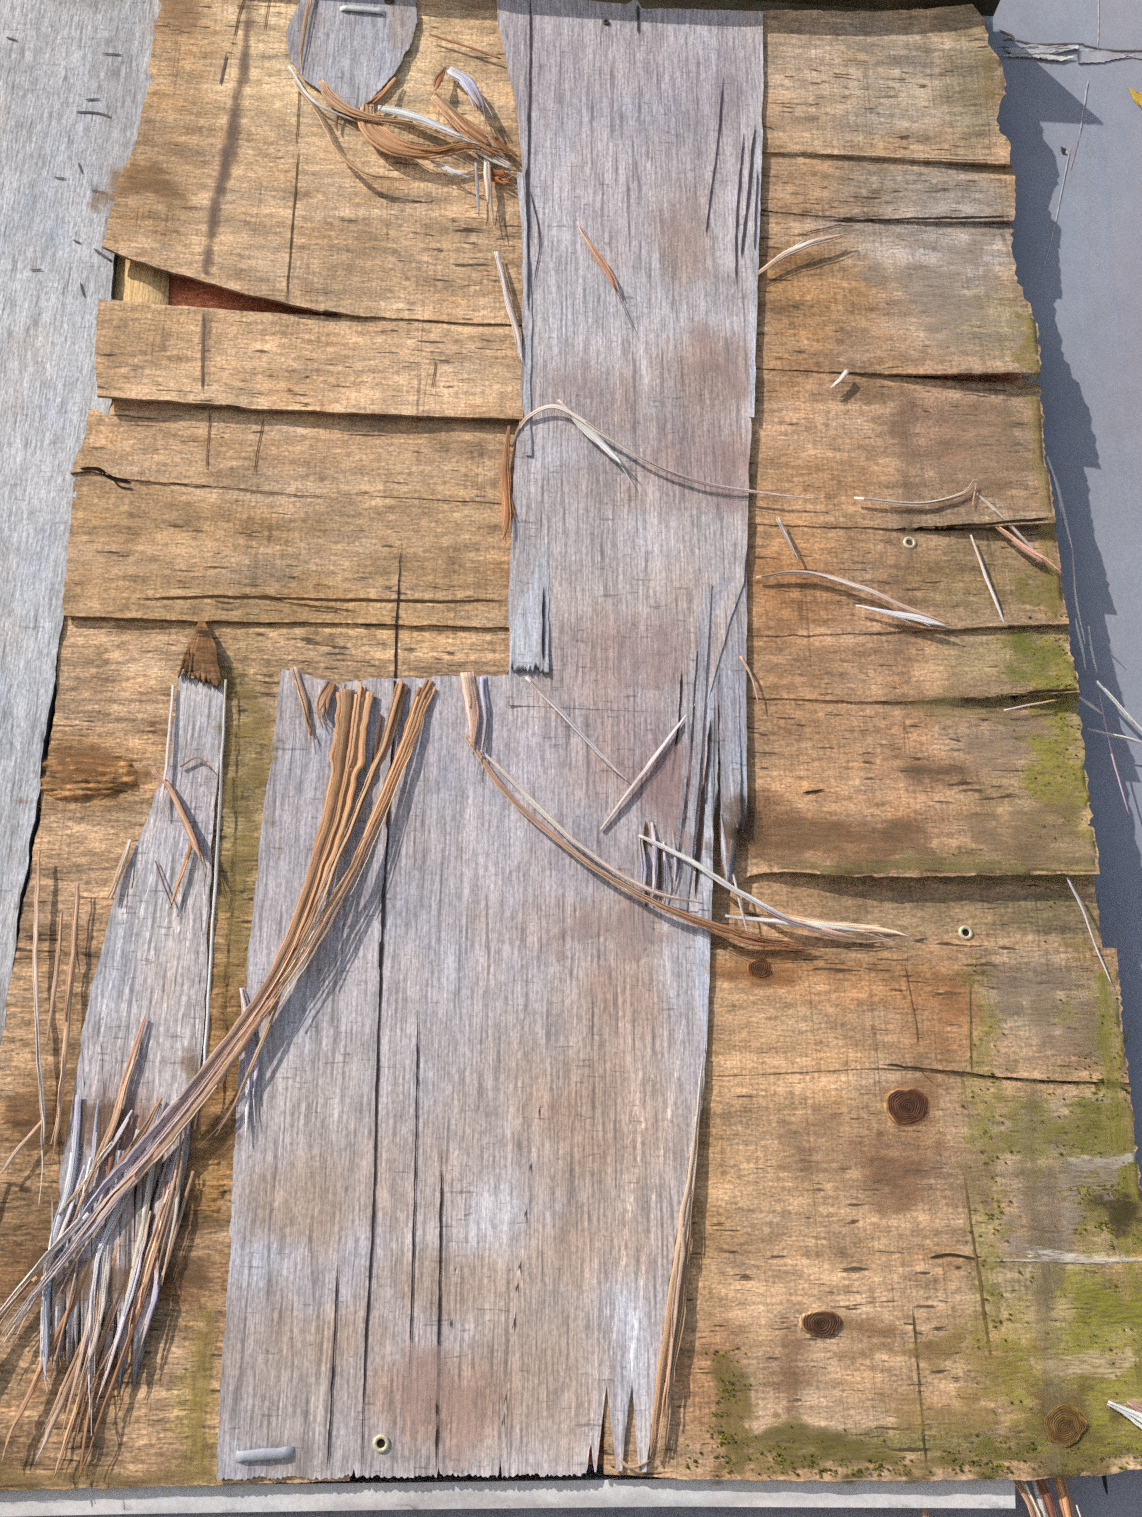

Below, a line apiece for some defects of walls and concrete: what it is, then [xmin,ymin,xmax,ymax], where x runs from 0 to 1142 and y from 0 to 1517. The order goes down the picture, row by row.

crack [634,5,642,33]
crack [706,84,1012,278]
crack [136,542,502,692]
crack [883,962,1129,1085]
crack [327,739,394,1475]
damp [1069,1153,1136,1168]
crack [409,1015,442,1470]
crack [930,1177,1142,1361]
damp [1027,1246,1142,1263]
crack [912,1306,926,1464]
damp [1045,1348,1142,1379]